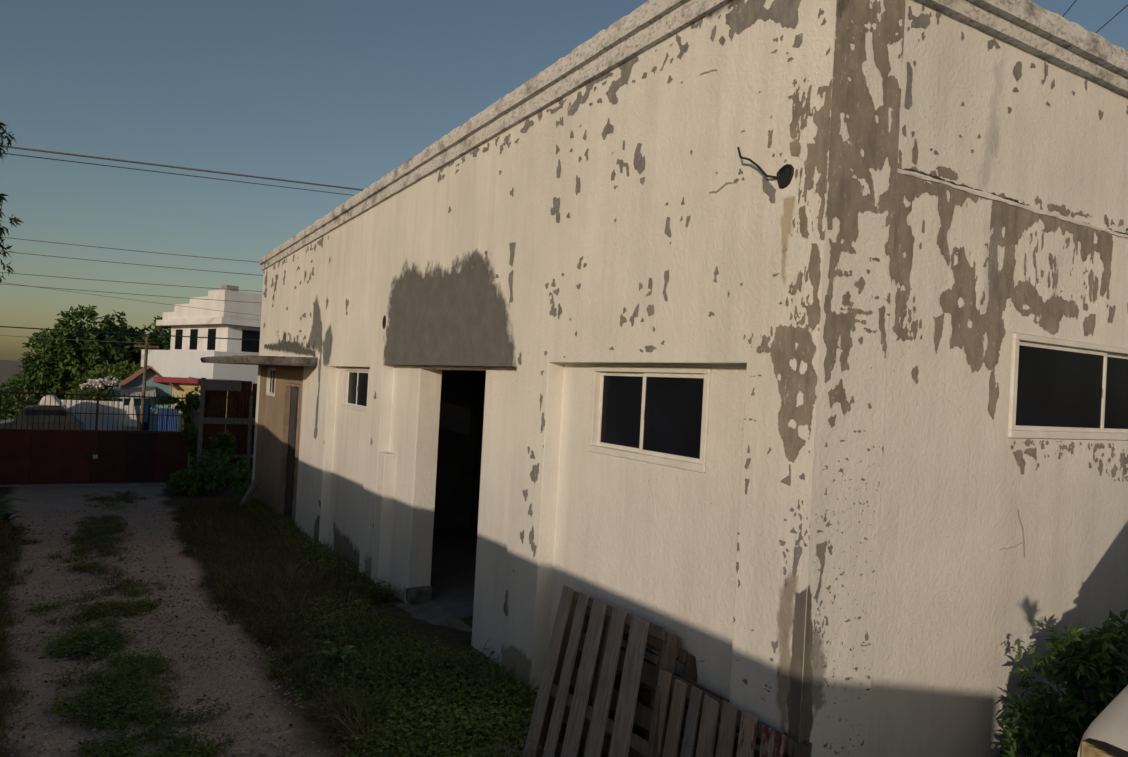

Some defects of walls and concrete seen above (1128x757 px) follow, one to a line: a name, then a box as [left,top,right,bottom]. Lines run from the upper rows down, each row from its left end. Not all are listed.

peeling [436,0,803,195]
peeling [263,236,331,310]
peeling [495,242,516,303]
peeling [550,197,570,223]
peeling [545,273,577,336]
peeling [620,270,669,352]
peeling [664,197,691,244]
peeling [743,0,1128,486]
peeling [520,393,545,558]
peeling [779,445,884,756]
leakage [777,575,824,743]